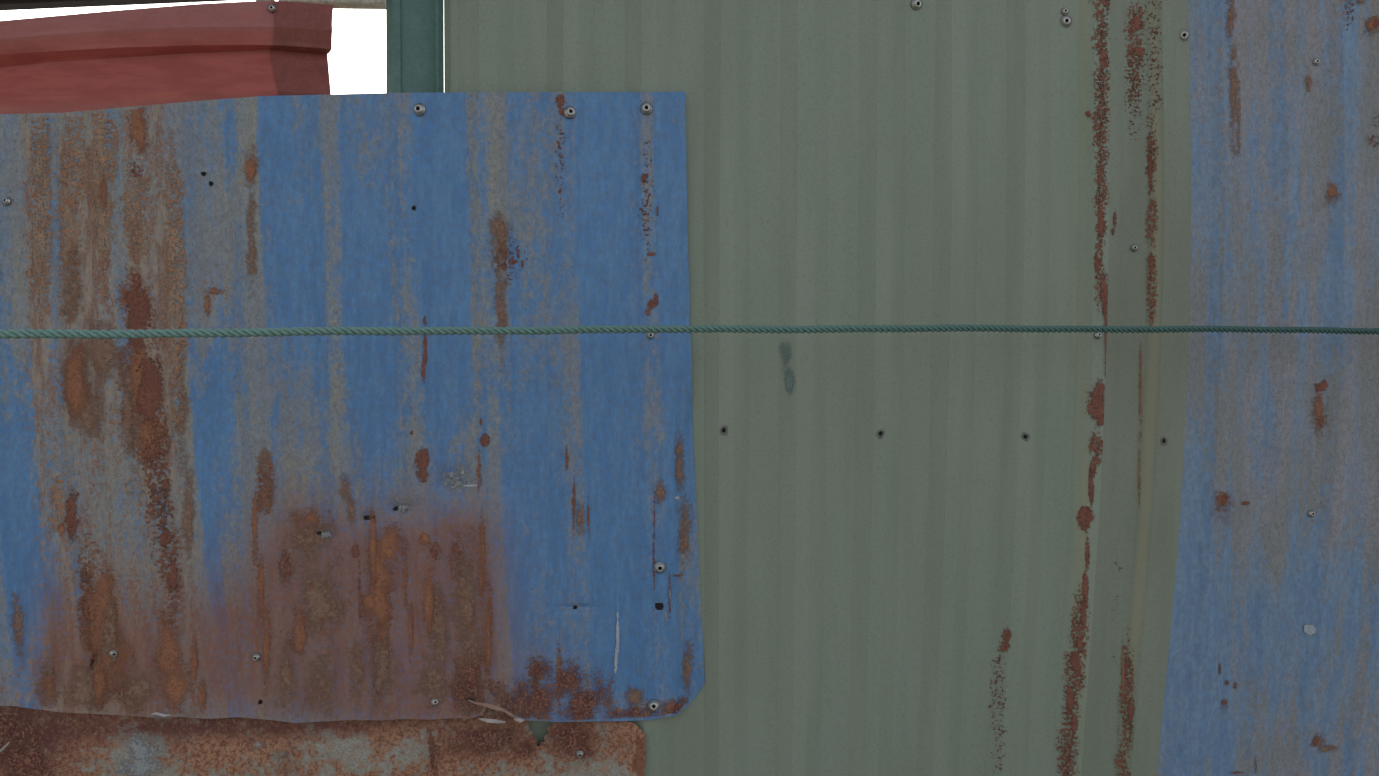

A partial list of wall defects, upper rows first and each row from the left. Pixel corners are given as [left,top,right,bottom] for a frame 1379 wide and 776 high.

corrosion [1340,0,1379,38]
corrosion [1085,0,1164,377]
corrosion [0,94,693,776]
corrosion [1216,492,1249,510]
corrosion [1313,380,1328,429]
corrosion [988,629,1012,772]
corrosion [1056,583,1091,776]
corrosion [1114,627,1136,776]
corrosion [1310,733,1337,752]